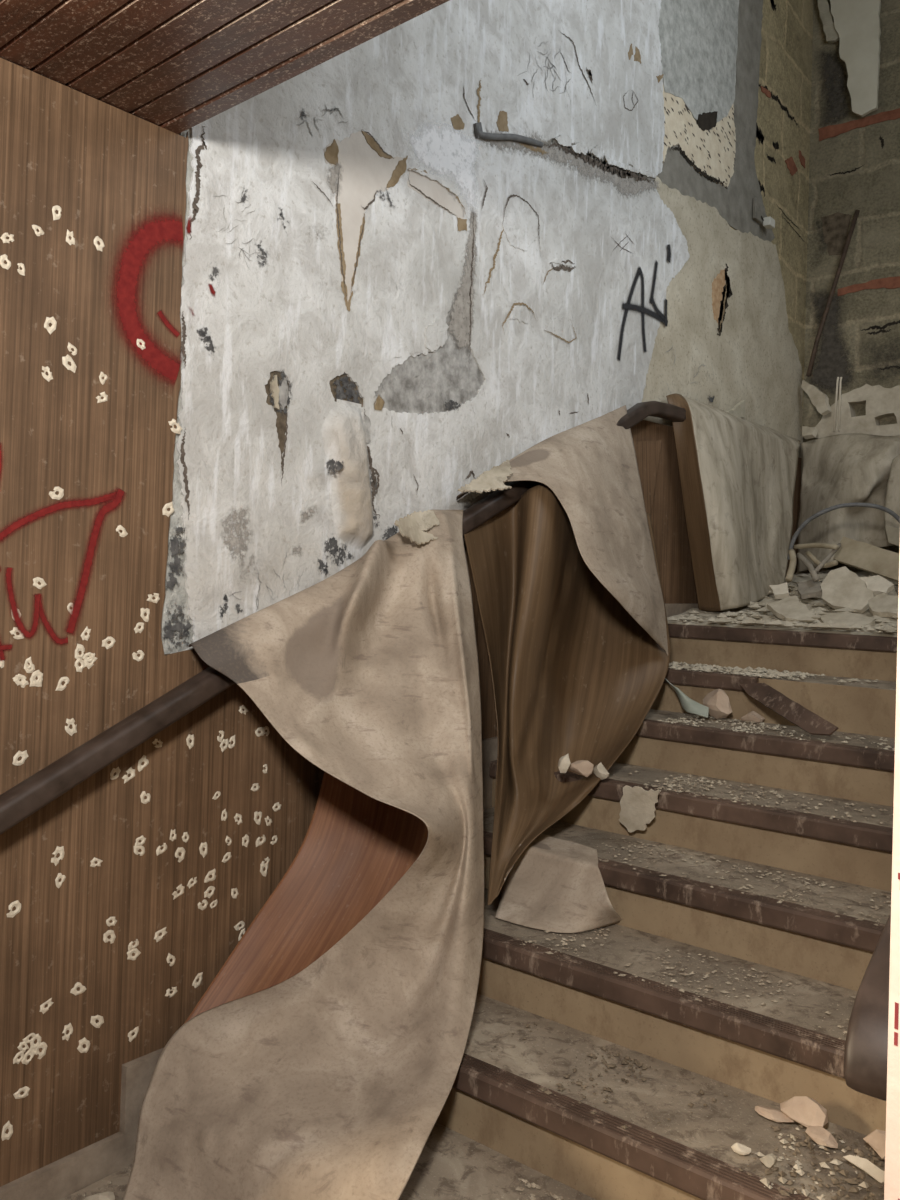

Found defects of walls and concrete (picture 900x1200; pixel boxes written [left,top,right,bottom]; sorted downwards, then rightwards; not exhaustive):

peeling [628,44,641,64]
peeling [496,111,509,132]
spalling [656,74,736,189]
spalling [818,108,900,142]
flaking render [313,80,485,518]
spalling [712,264,733,336]
spalling [838,276,900,296]
flaking render [265,371,291,486]
spalling [815,384,900,439]